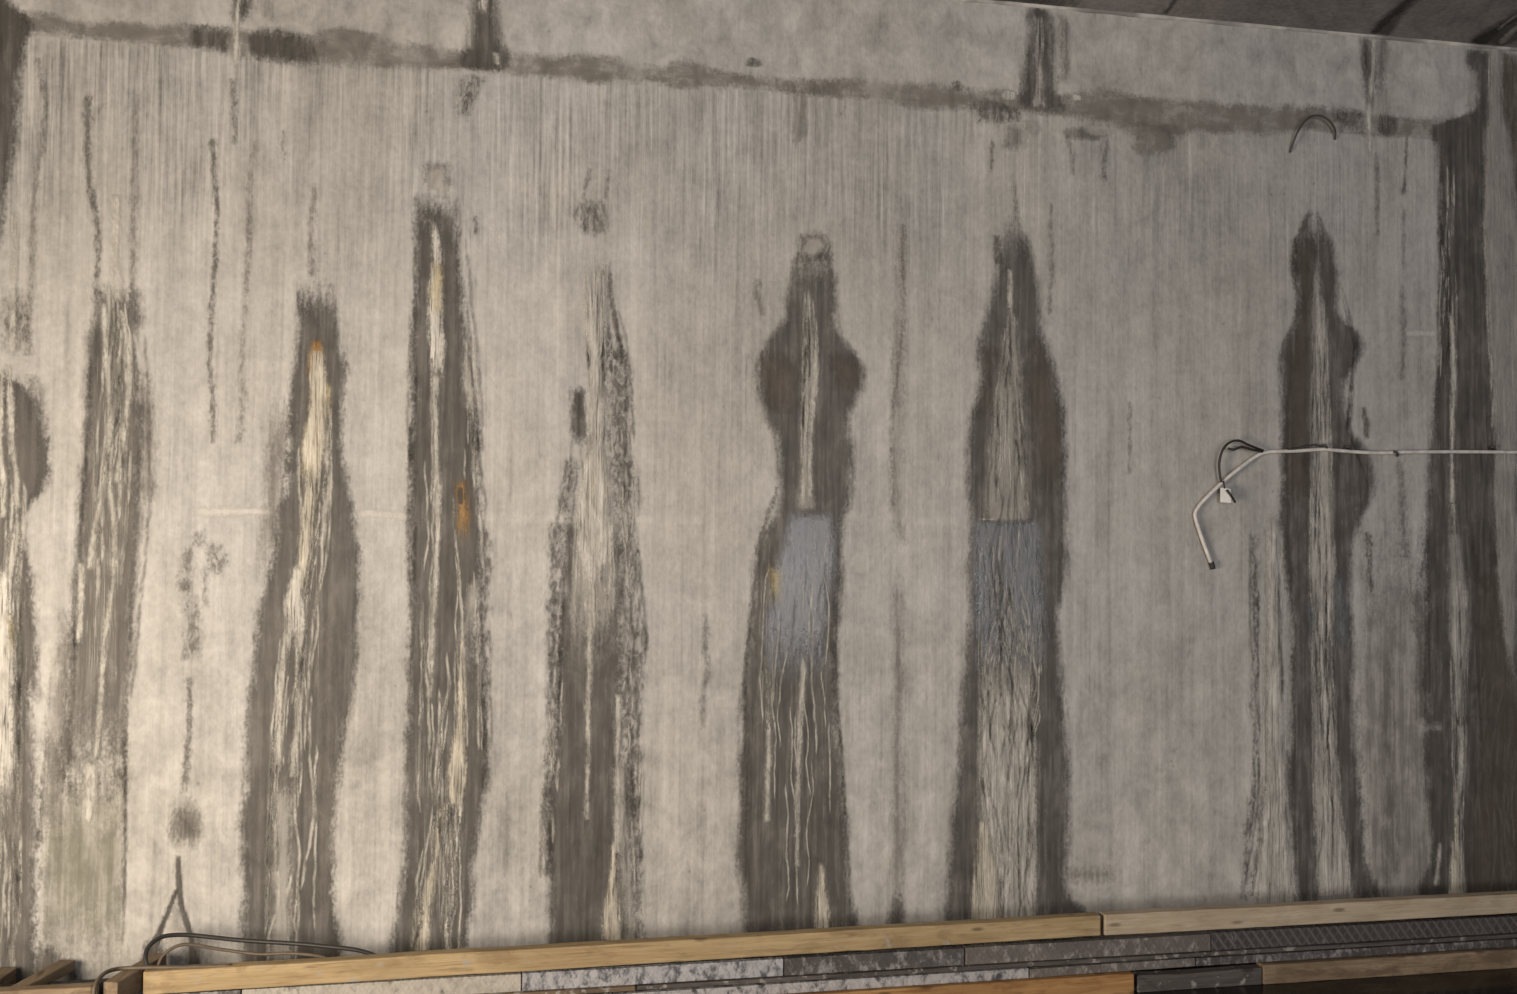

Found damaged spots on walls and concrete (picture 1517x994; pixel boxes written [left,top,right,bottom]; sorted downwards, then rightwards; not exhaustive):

damp [645,63,864,97]
damp [0,0,626,983]
damp [543,267,644,944]
damp [736,236,864,933]
damp [887,0,1517,924]